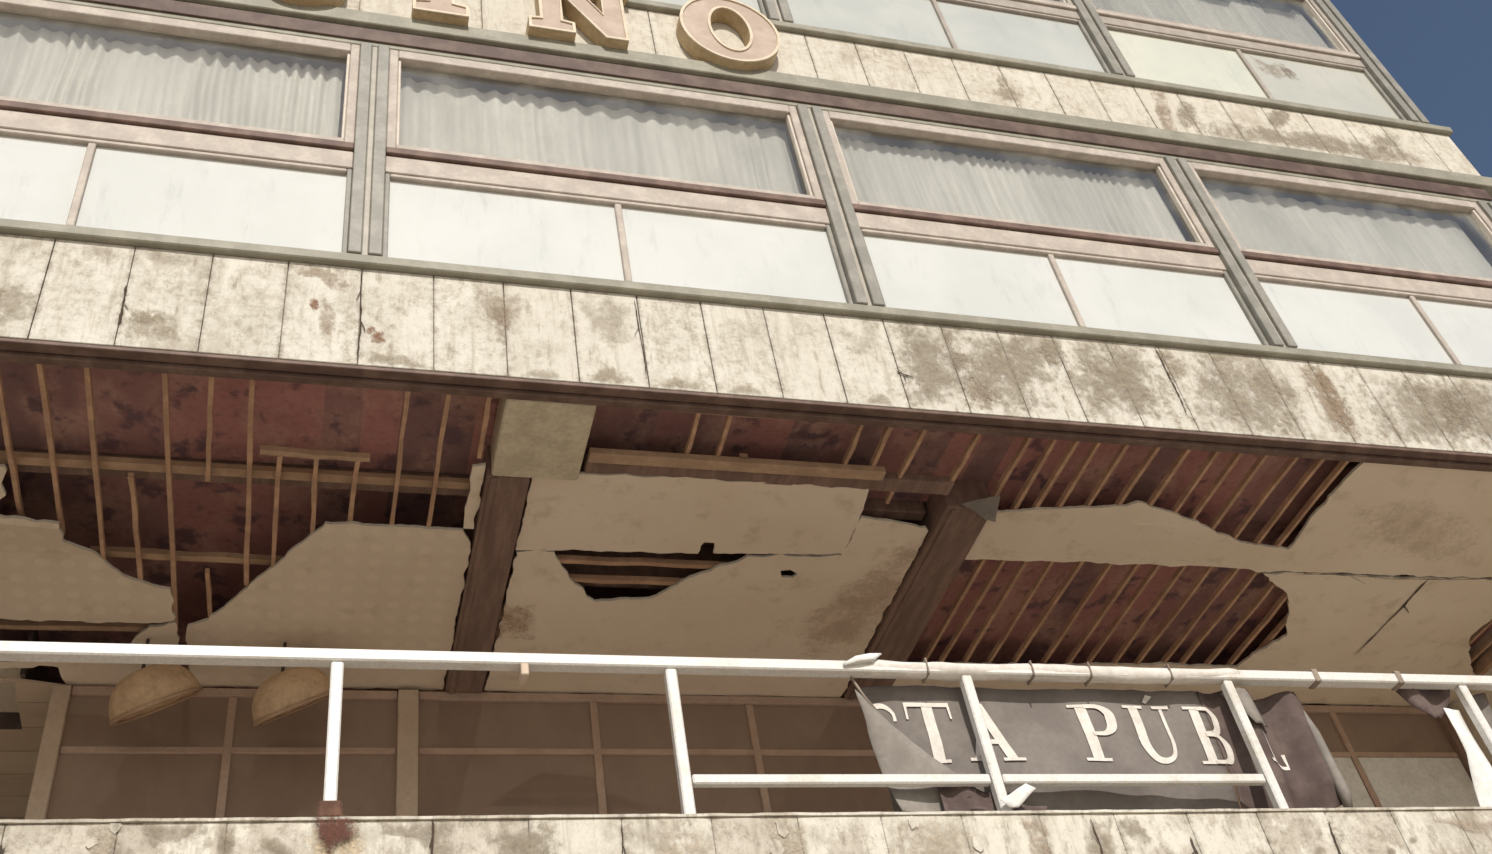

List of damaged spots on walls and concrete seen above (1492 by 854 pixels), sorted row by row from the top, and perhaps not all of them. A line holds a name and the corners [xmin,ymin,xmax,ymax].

damp [1151,92,1199,132]
damp [1217,110,1415,160]
damp [304,264,345,334]
damp [593,369,632,382]
damp [901,324,1303,433]
damp [1303,369,1353,432]
damp [1382,380,1492,440]
crack [1307,574,1475,649]
damp [217,827,235,854]
rust [314,814,362,854]
damp [500,823,553,854]
damp [1087,818,1150,854]